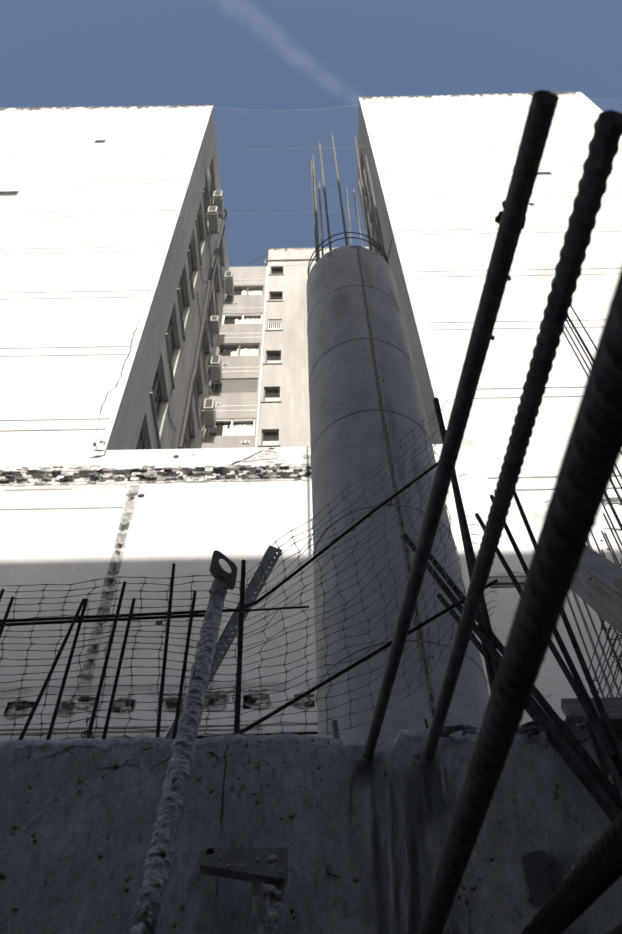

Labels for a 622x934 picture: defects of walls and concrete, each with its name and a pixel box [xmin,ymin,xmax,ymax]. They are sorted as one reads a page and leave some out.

spalling [0,439,312,486]